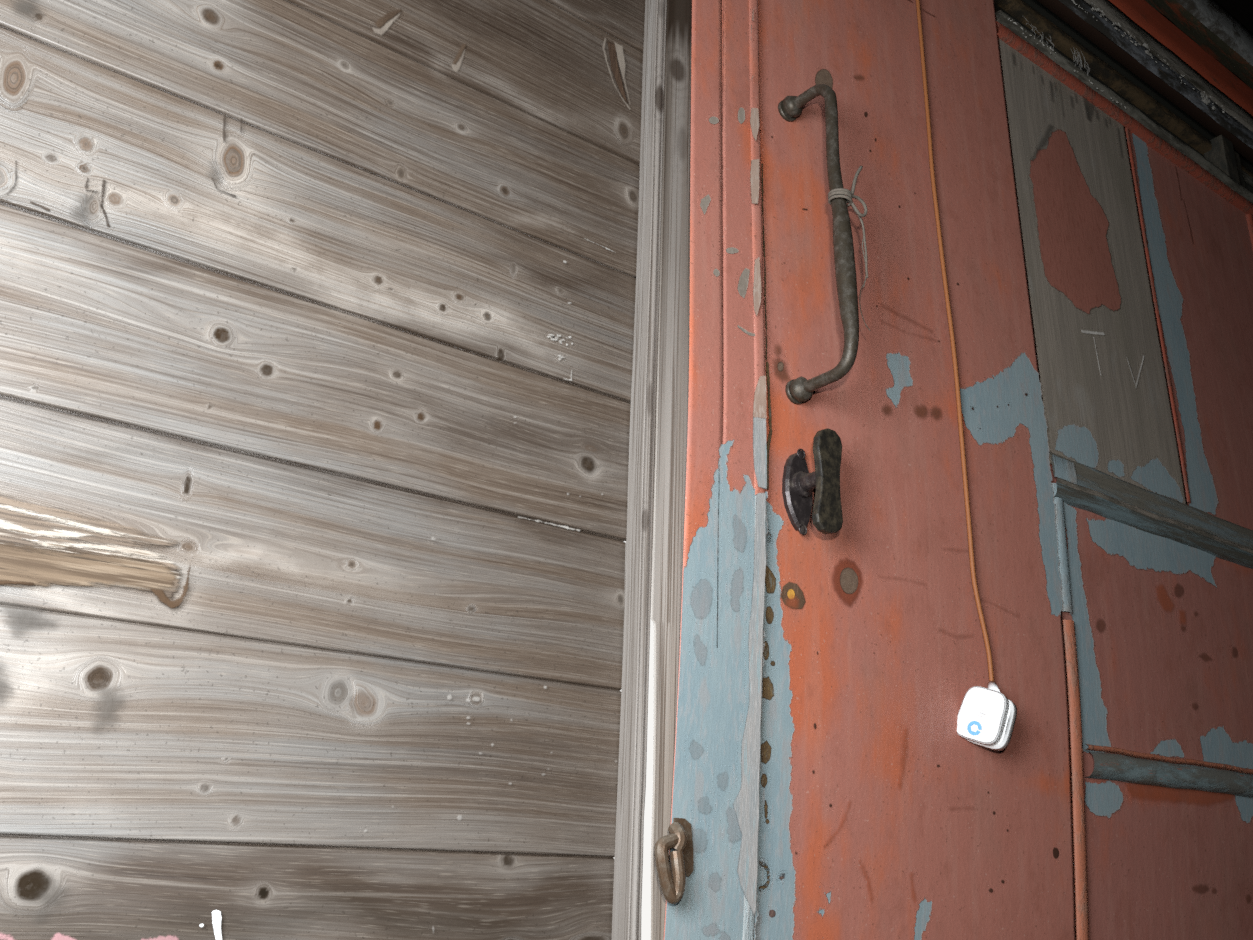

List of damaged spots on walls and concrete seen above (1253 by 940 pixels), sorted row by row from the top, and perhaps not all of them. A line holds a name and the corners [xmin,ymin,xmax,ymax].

peeling [750,159,759,204]
peeling [737,257,761,316]
peeling [886,352,913,407]
peeling [960,133,1218,753]
peeling [665,376,796,940]
peeling [1150,738,1184,758]
peeling [1200,726,1253,769]
peeling [1085,780,1123,818]
peeling [1235,795,1253,823]